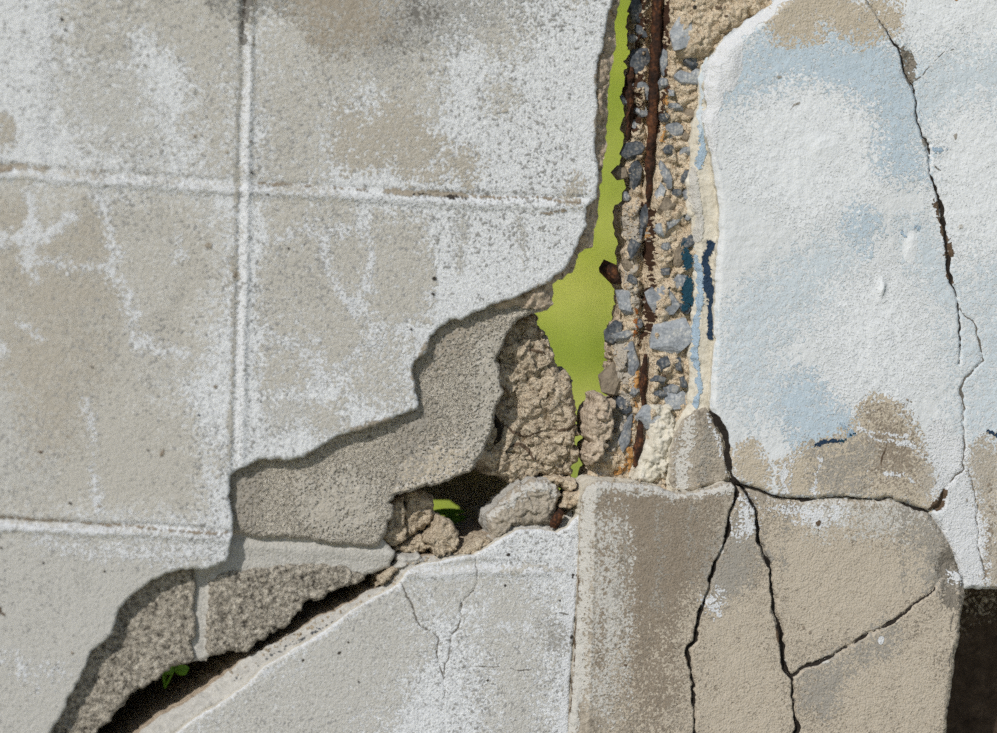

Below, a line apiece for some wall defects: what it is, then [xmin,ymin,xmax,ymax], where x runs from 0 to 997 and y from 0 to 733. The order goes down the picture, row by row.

rust [635,0,674,52]
rust [630,71,647,142]
rust [656,64,671,142]
peeling [556,169,591,212]
rust [633,201,658,346]
spalling [577,0,726,478]
crack [867,1,985,571]
peeling [0,0,573,733]
rust [614,370,641,475]
crack [400,562,543,711]
crack [544,551,580,712]
crack [685,411,935,733]